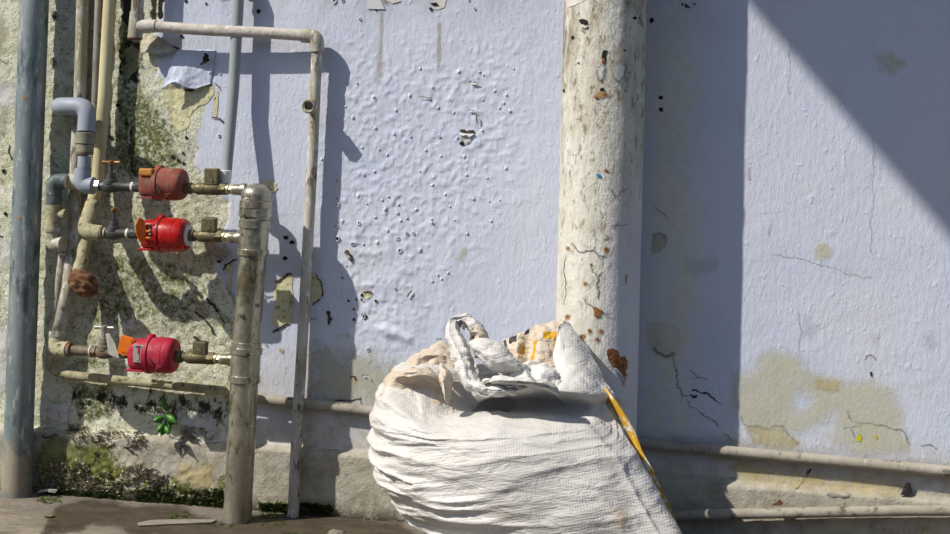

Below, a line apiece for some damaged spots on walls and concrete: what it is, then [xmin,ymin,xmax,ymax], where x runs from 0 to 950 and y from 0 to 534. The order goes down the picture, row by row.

peeling [140,35,224,131]
spalling [272,273,294,333]
spalling [311,272,323,305]
crack [673,356,798,443]
leakage [178,442,212,488]
crack [795,469,812,490]